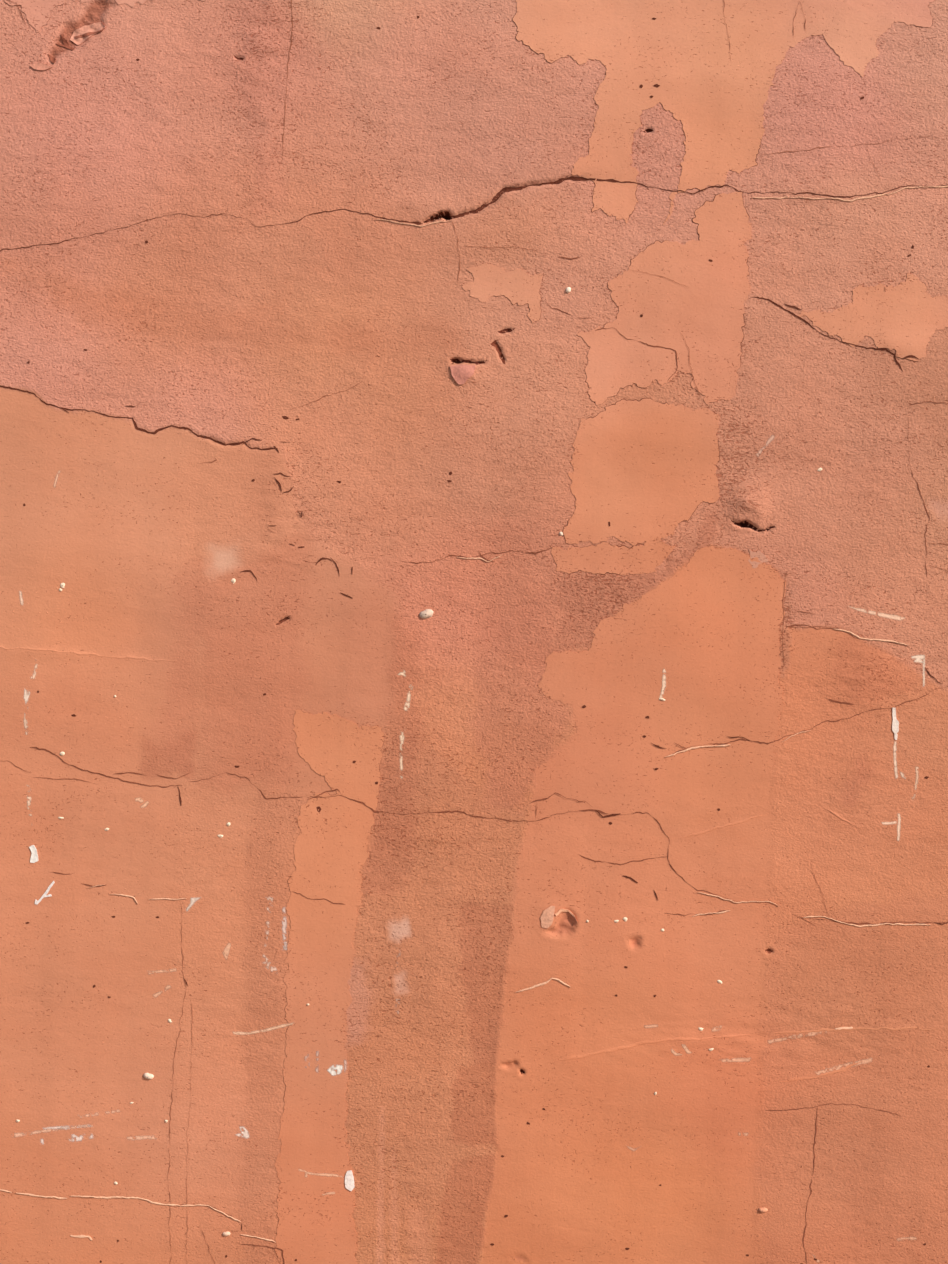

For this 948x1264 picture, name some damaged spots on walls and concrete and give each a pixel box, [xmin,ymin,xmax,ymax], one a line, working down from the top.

spalling [4,0,147,70]
spalling [424,211,451,222]
crack [0,136,948,282]
spalling [450,328,515,385]
peeling [512,0,948,822]
crack [755,297,918,371]
damp [358,611,431,902]
crack [9,747,948,927]
crack [0,872,284,1264]
peeling [229,709,527,1264]
damp [344,951,413,1071]
damp [373,897,520,1264]